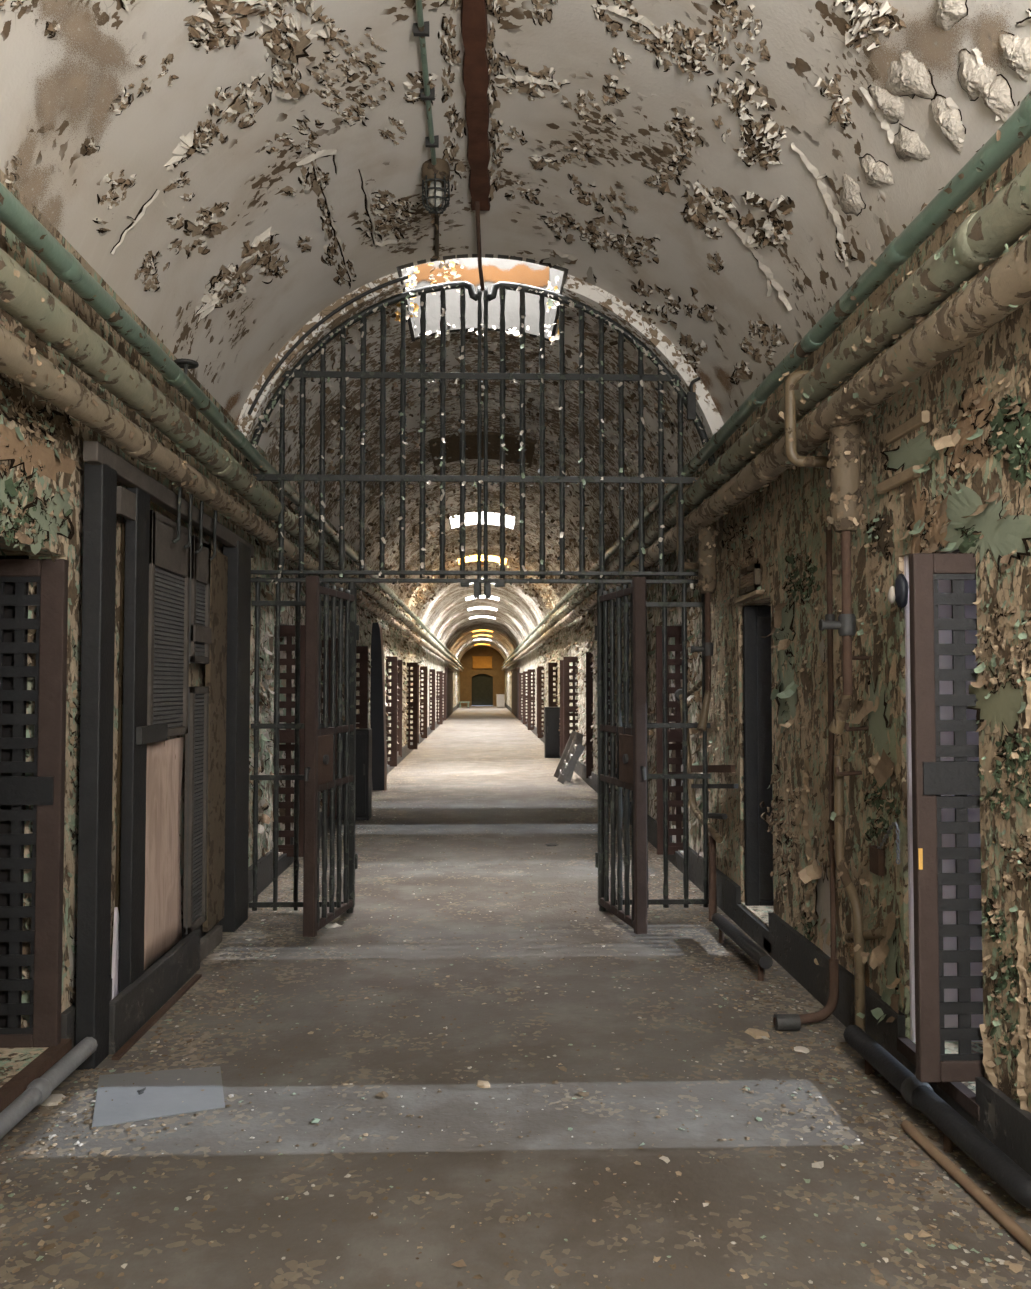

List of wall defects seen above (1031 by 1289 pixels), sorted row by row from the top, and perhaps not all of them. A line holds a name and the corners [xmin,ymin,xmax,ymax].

water stain [6,0,152,236]
crack [110,189,160,255]